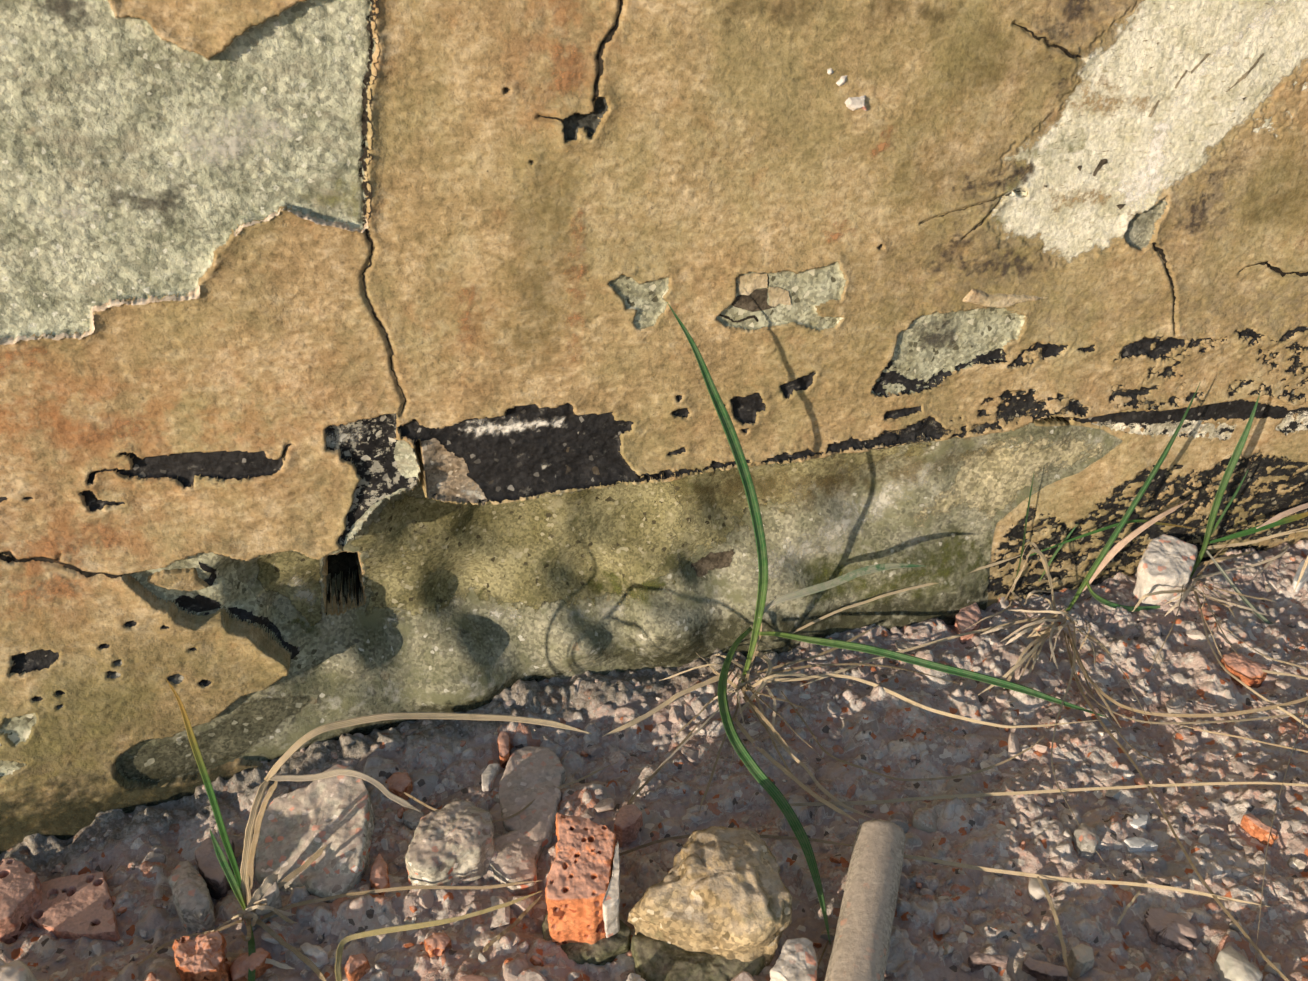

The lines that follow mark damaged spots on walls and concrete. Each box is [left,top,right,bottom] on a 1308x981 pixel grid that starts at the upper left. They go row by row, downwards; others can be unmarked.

crack [592,0,623,101]
crack [1013,23,1084,59]
peeling [0,0,376,345]
crack [358,0,406,413]
peeling [992,0,1308,263]
peeling [609,275,670,329]
peeling [716,262,846,331]
crack [1152,242,1176,333]
crack [1239,261,1308,277]
peeling [80,450,283,512]
crack [0,552,137,578]
spalling [115,289,1308,783]